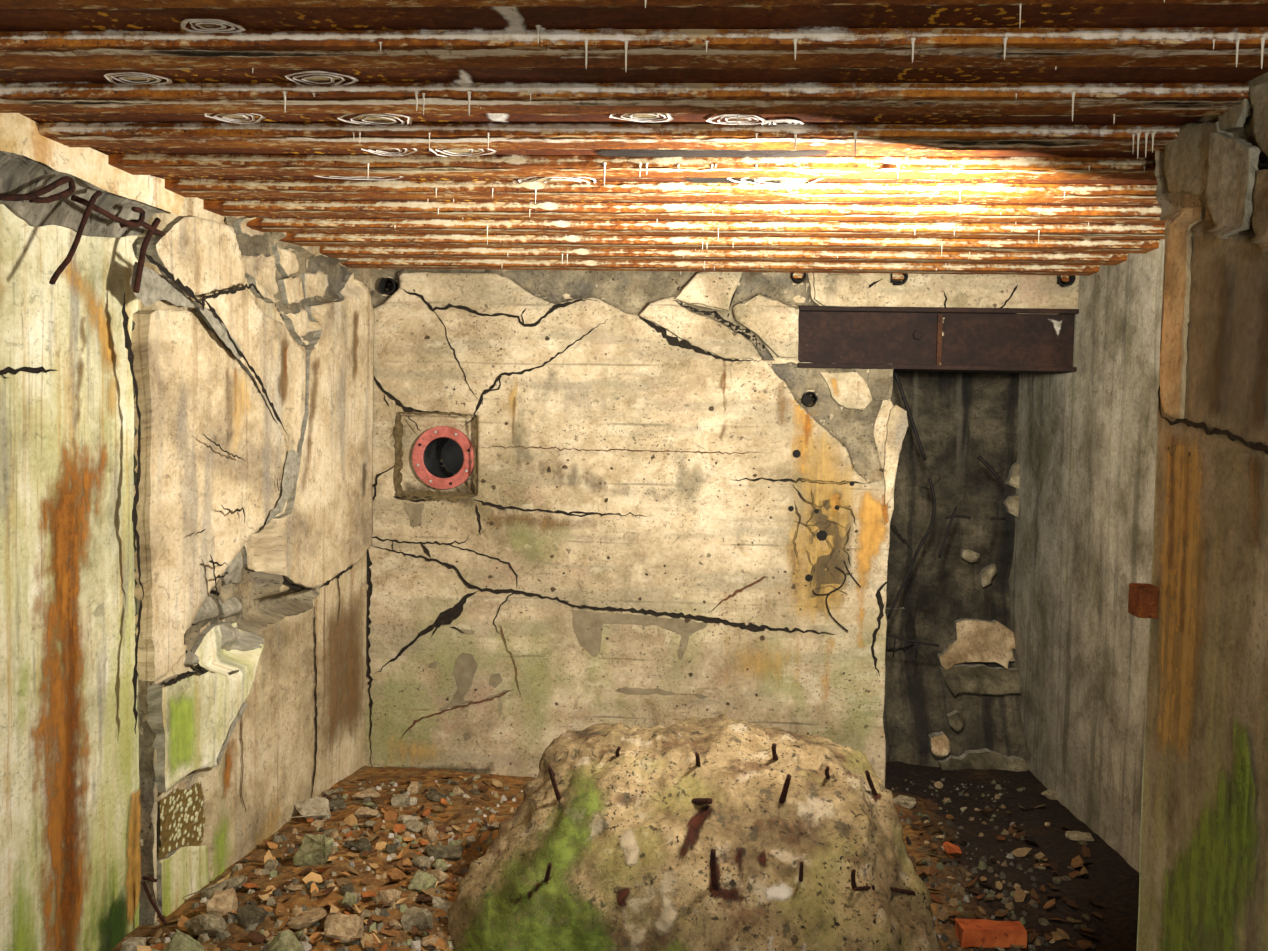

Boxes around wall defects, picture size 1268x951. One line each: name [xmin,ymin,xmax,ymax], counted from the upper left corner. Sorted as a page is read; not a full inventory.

leakage [0,3,1268,281]
rust [609,114,673,122]
rust [707,114,804,126]
peeling [1154,72,1268,252]
crack [0,366,57,379]
spalling [224,217,884,486]
rust [32,447,108,951]
crack [195,505,249,597]
spalling [184,548,320,675]
crack [283,288,888,798]
spalling [778,496,852,607]
rust [793,399,888,612]